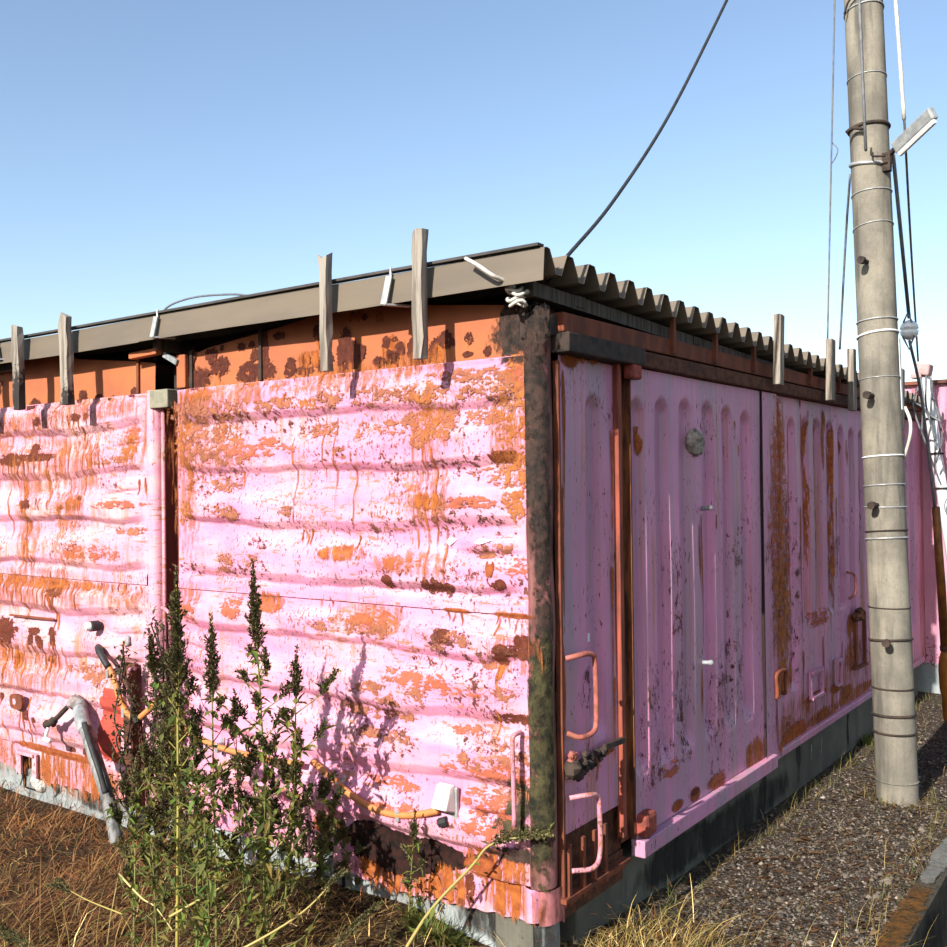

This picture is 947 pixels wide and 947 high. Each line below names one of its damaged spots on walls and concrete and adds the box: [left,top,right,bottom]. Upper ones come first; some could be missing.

rust [179,312,492,404]
peeling [168,353,540,639]
rust [0,387,154,801]
peeling [313,623,555,892]
rust [429,607,469,624]
rust [493,612,533,637]
damp [532,484,554,770]
peeling [640,649,692,808]
peeling [672,563,683,643]
peeling [705,615,744,774]
rust [747,397,872,769]
rust [355,842,540,921]